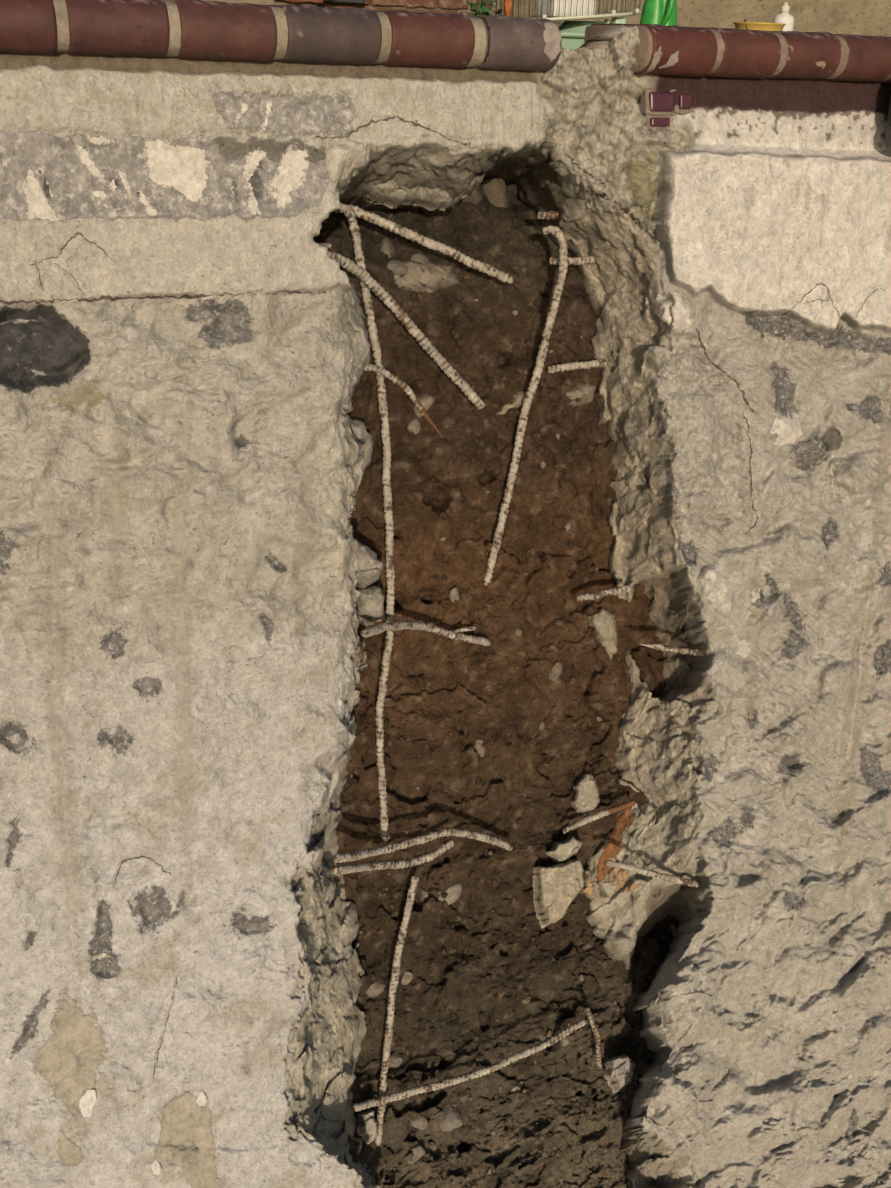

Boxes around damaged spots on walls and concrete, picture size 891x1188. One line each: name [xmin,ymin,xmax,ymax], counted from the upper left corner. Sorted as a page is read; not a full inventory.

crack [0,232,326,305]
crack [782,283,883,316]
crack [696,328,758,534]
spalling [576,585,631,602]
spalling [639,644,705,657]
spalling [315,203,607,1145]
spalling [562,800,636,834]
corrosion [580,807,644,903]
spalling [605,860,702,888]